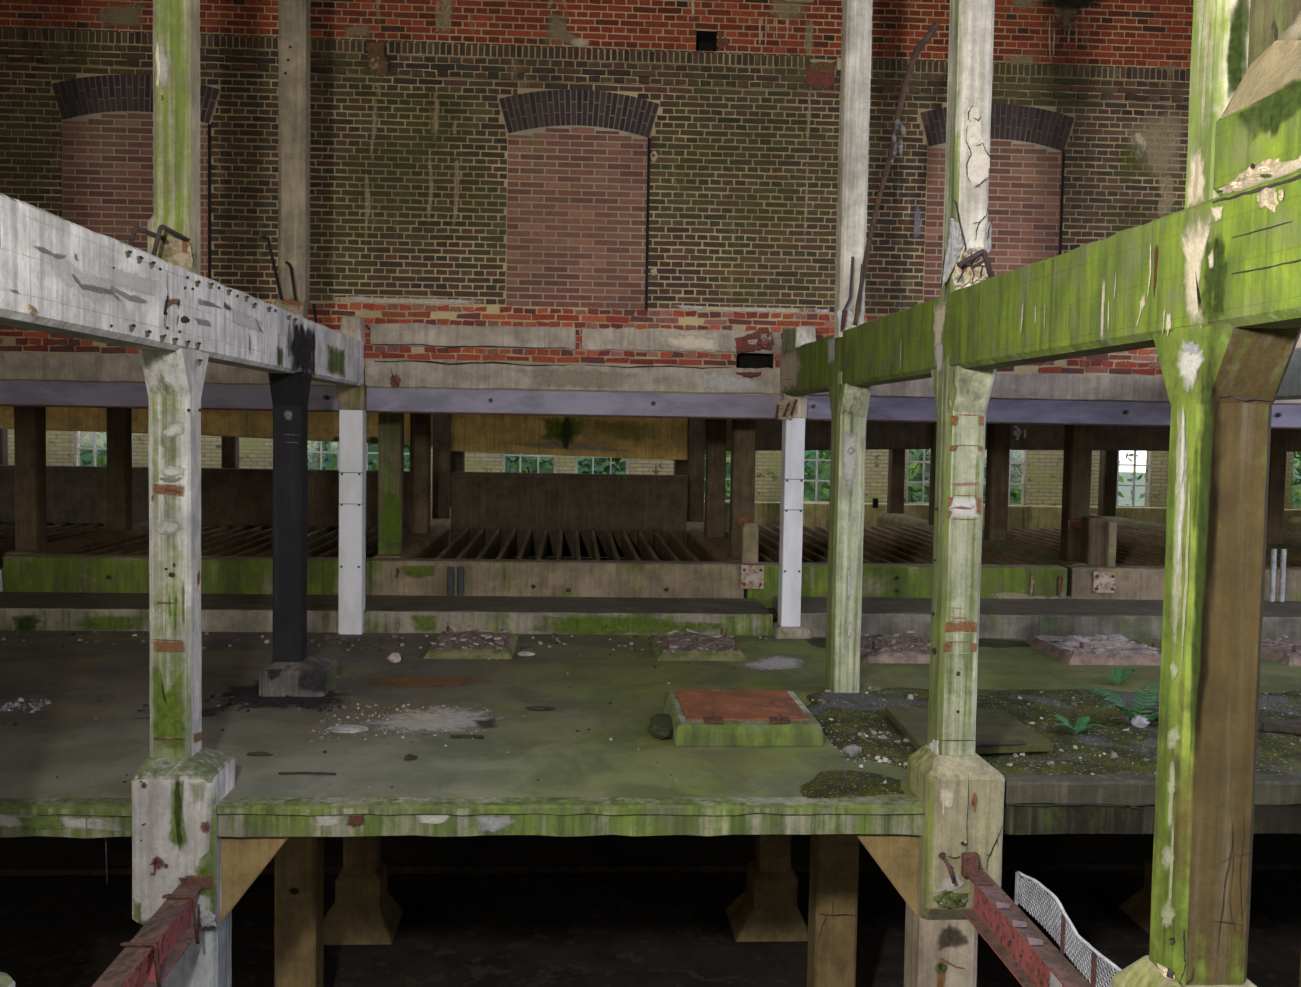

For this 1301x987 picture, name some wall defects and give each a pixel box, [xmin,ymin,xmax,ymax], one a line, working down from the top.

spalling [965,105,991,188]
leakage [1133,118,1180,213]
peeling [1181,151,1301,318]
leakage [288,324,315,373]
peeling [1136,244,1151,326]
peeling [1162,310,1171,335]
peeling [1178,340,1204,392]